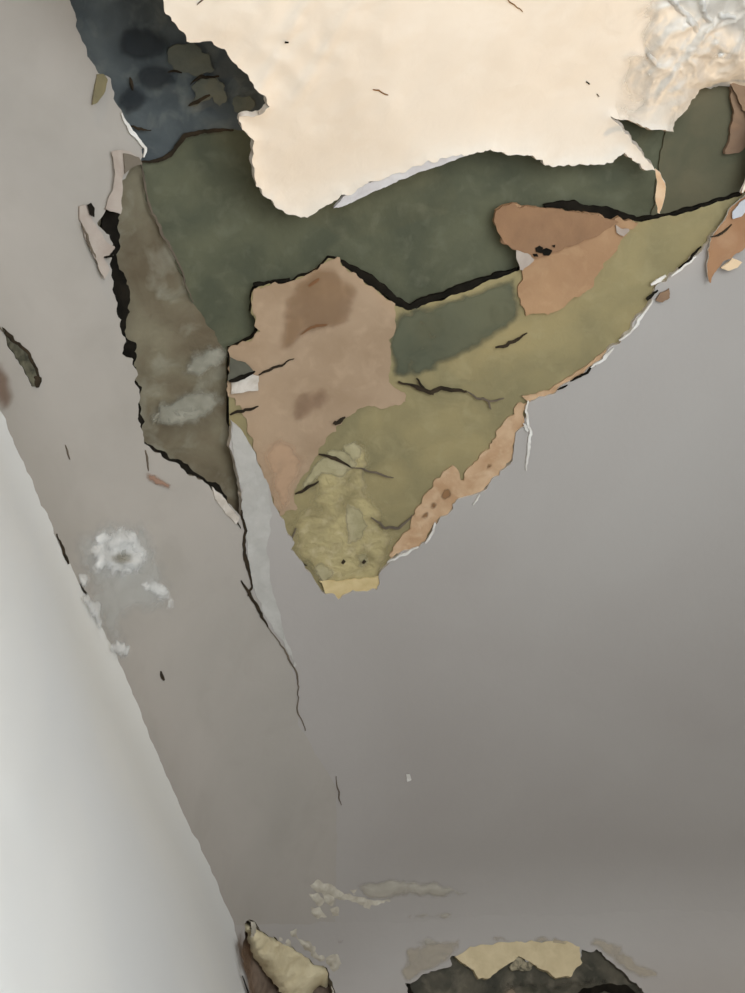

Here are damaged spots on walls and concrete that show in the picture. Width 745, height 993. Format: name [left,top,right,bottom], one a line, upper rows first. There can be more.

spalling [2,327,42,388]
peeling [70,0,745,667]
efflorescence [92,529,146,573]
efflorescence [143,582,168,598]
crack [227,502,306,731]
peeling [309,879,452,919]
spalling [242,919,342,993]
spalling [404,938,656,993]